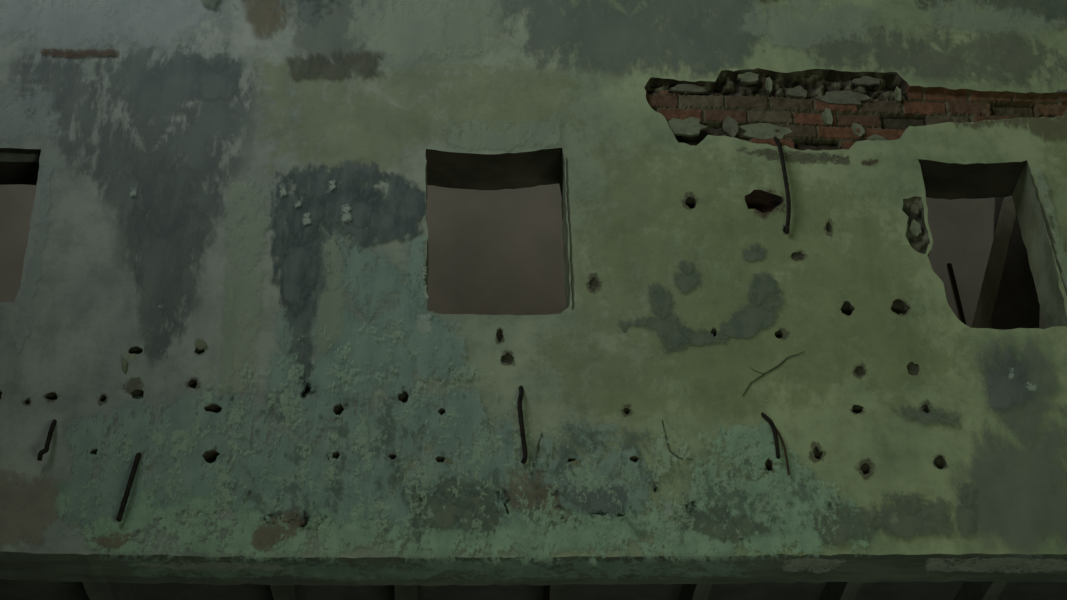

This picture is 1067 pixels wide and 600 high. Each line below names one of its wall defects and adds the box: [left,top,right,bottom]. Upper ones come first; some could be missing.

water stain [287,0,872,80]
water stain [0,0,251,357]
spalling [644,68,1067,234]
spalling [902,196,930,254]
water stain [58,180,1067,581]